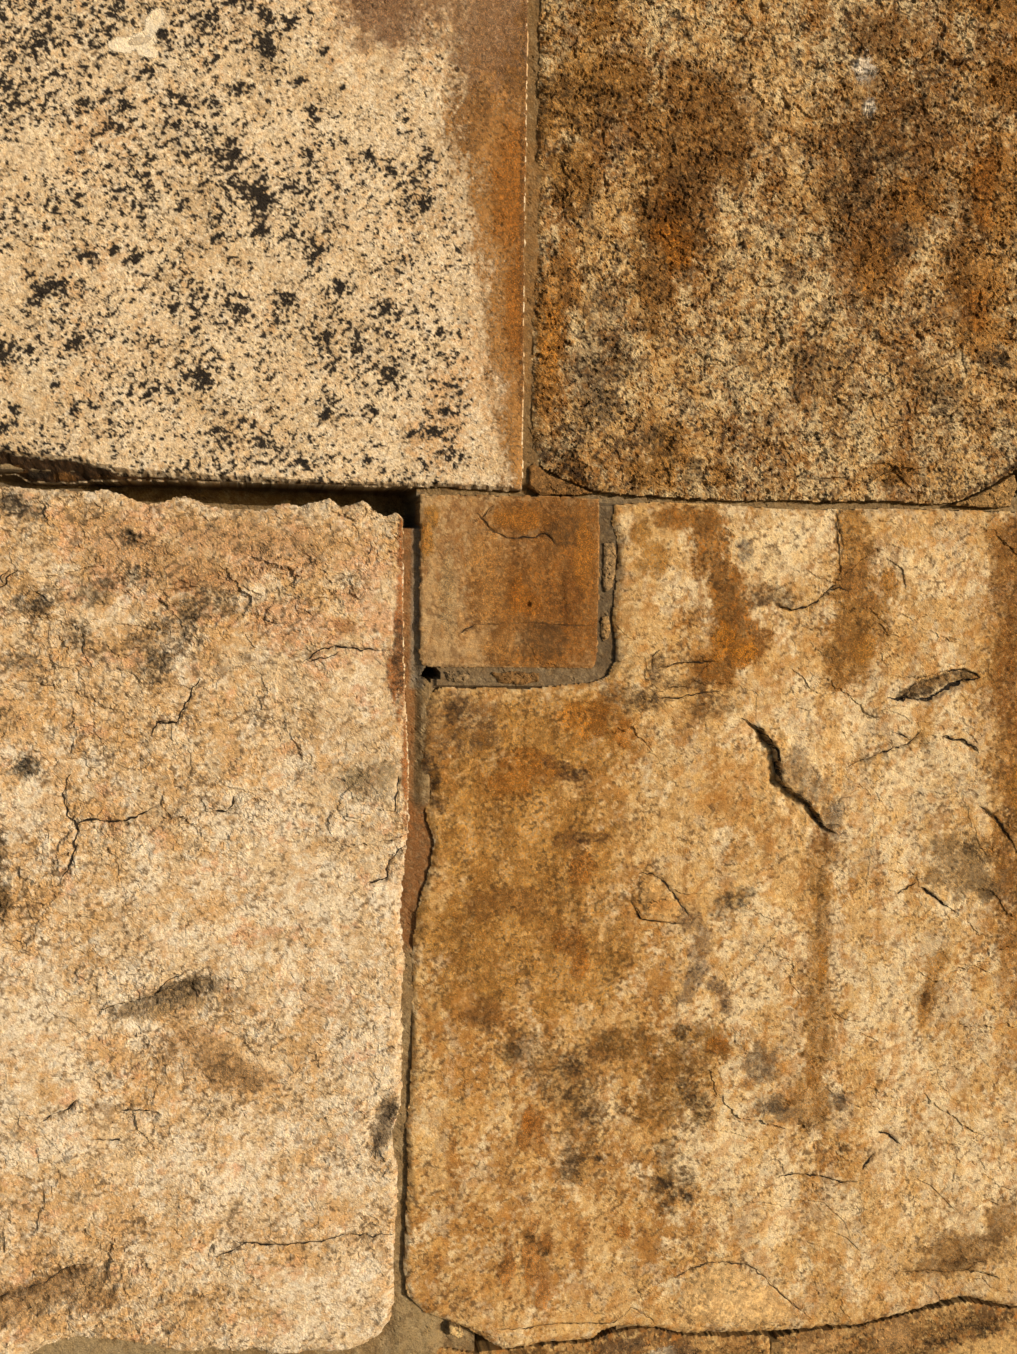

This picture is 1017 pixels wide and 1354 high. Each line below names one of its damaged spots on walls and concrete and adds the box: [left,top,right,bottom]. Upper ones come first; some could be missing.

leakage [332,0,527,92]
crack [777,585,849,611]
crack [848,669,981,767]
crack [742,718,840,834]